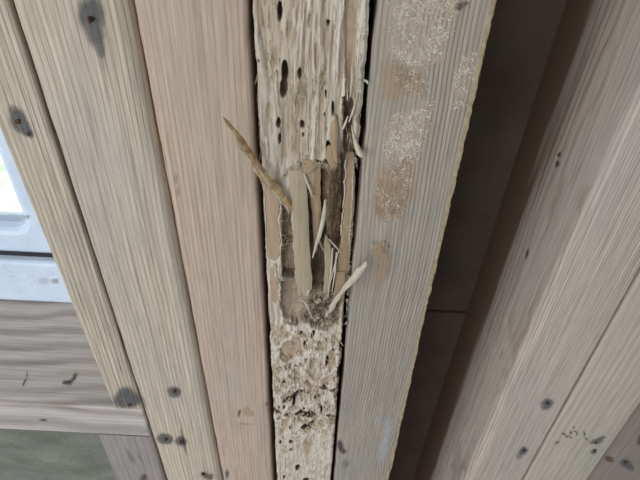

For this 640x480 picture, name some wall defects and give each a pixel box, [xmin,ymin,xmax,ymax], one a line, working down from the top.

peeling [317,115,346,218]
peeling [351,125,365,158]
hole [306,177,341,290]
hole [274,384,337,428]